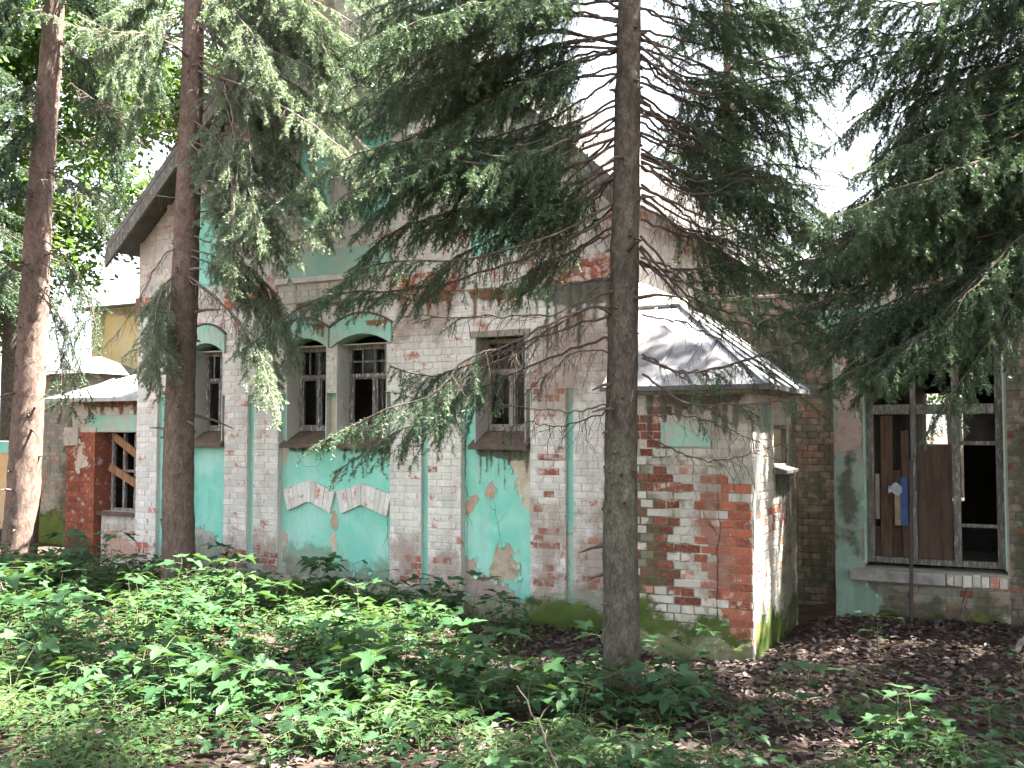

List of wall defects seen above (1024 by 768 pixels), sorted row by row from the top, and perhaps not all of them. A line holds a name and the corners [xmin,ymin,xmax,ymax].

spalling [526,373,565,401]
flaking render [195,510,451,592]
flaking render [465,480,497,515]
flaking render [465,539,566,602]
flaking render [506,446,566,512]
spalling [531,528,560,550]
spalling [637,406,787,647]
damp [838,453,859,555]